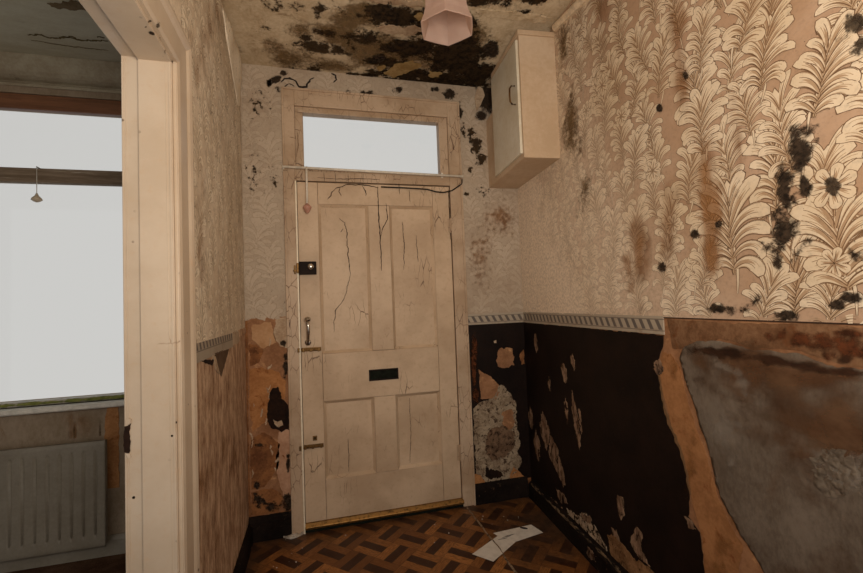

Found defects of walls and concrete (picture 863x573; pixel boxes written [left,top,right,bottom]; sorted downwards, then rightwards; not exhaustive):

water stain [251,0,547,177]
water stain [844,13,863,56]
water stain [761,125,819,269]
water stain [825,177,841,196]
flaking render [494,340,525,368]
water stain [698,294,760,315]
water stain [828,292,862,310]
flaking render [248,316,291,516]
flaking render [473,369,523,484]
peeling [564,393,583,449]
peeling [528,408,654,573]
peeling [654,319,863,573]